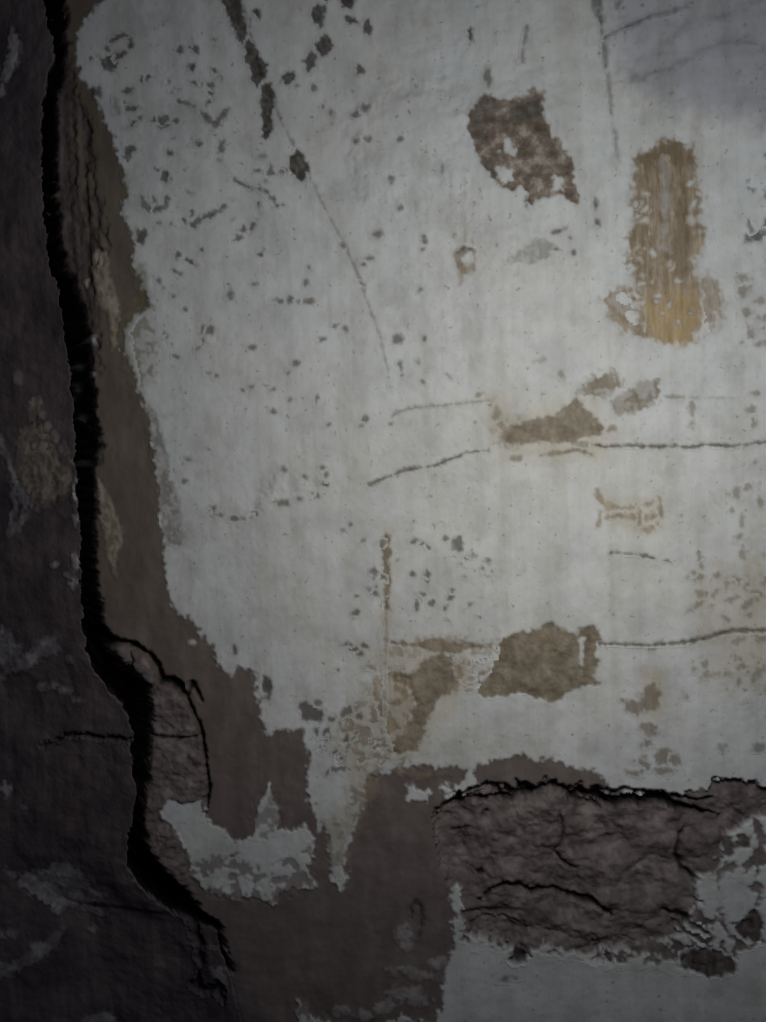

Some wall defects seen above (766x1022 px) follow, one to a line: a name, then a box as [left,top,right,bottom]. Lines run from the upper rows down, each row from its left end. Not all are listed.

peeling [120,34,232,167]
peeling [463,64,604,232]
flaking render [49,0,151,483]
peeling [501,224,578,268]
rust [597,133,734,362]
peeling [731,270,766,351]
crack [35,0,234,1007]
crack [365,447,492,489]
crack [588,437,766,452]
peeling [90,310,766,1022]
crack [596,625,766,649]
crack [433,778,719,920]